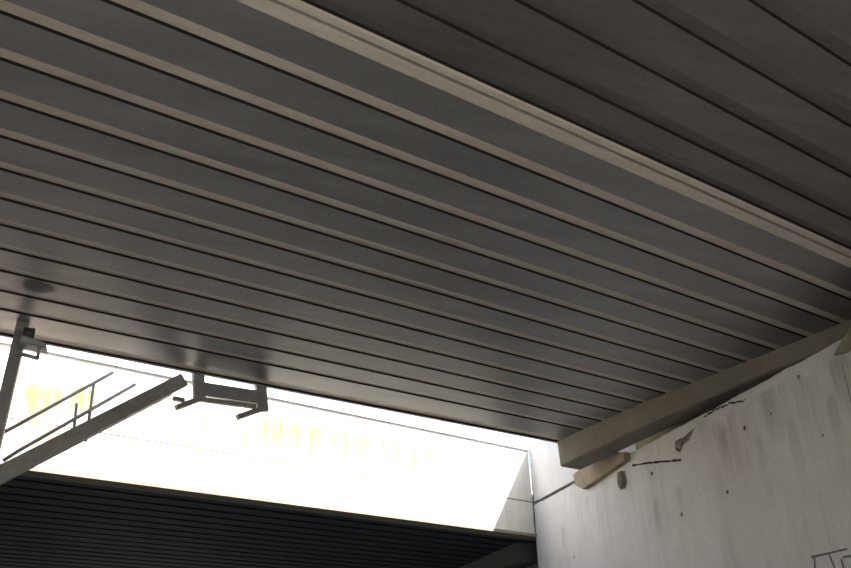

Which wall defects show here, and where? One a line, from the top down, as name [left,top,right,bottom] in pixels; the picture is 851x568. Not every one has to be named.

water stain [204,403,507,462]